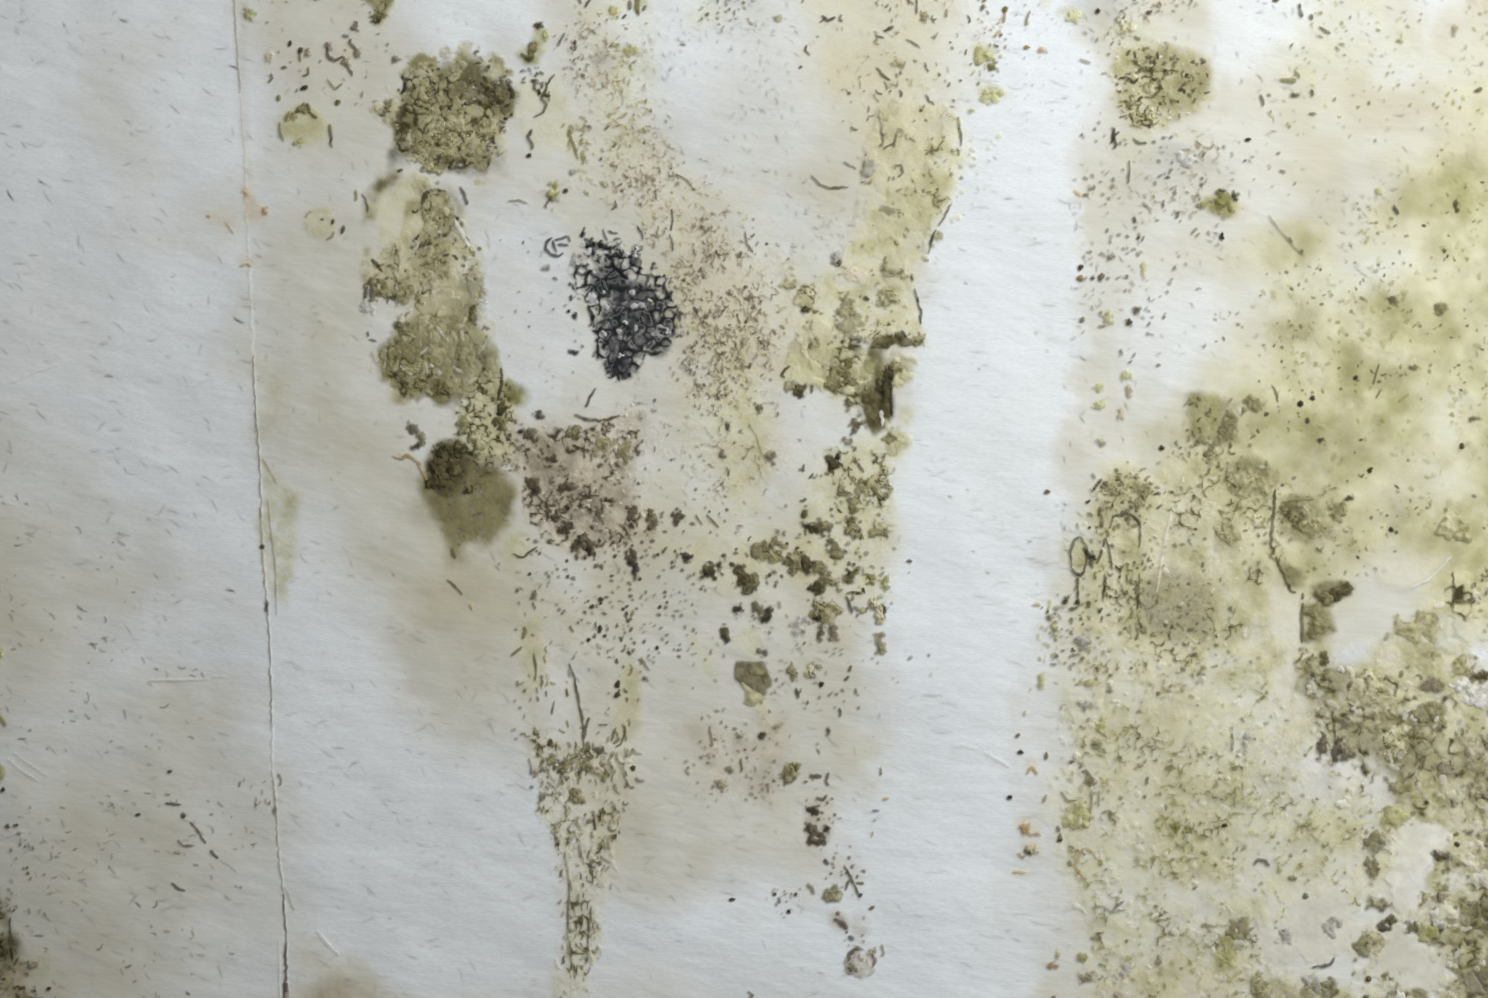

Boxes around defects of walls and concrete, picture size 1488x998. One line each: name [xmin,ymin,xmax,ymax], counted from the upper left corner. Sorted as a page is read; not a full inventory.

mould [970,0,1008,112]
mould [1067,8,1101,23]
mould [1077,0,1246,335]
mould [1260,70,1315,115]
crack [253,356,293,722]
damp [266,0,925,998]
damp [1033,169,1488,998]
mould [0,892,51,998]
crack [273,774,289,998]